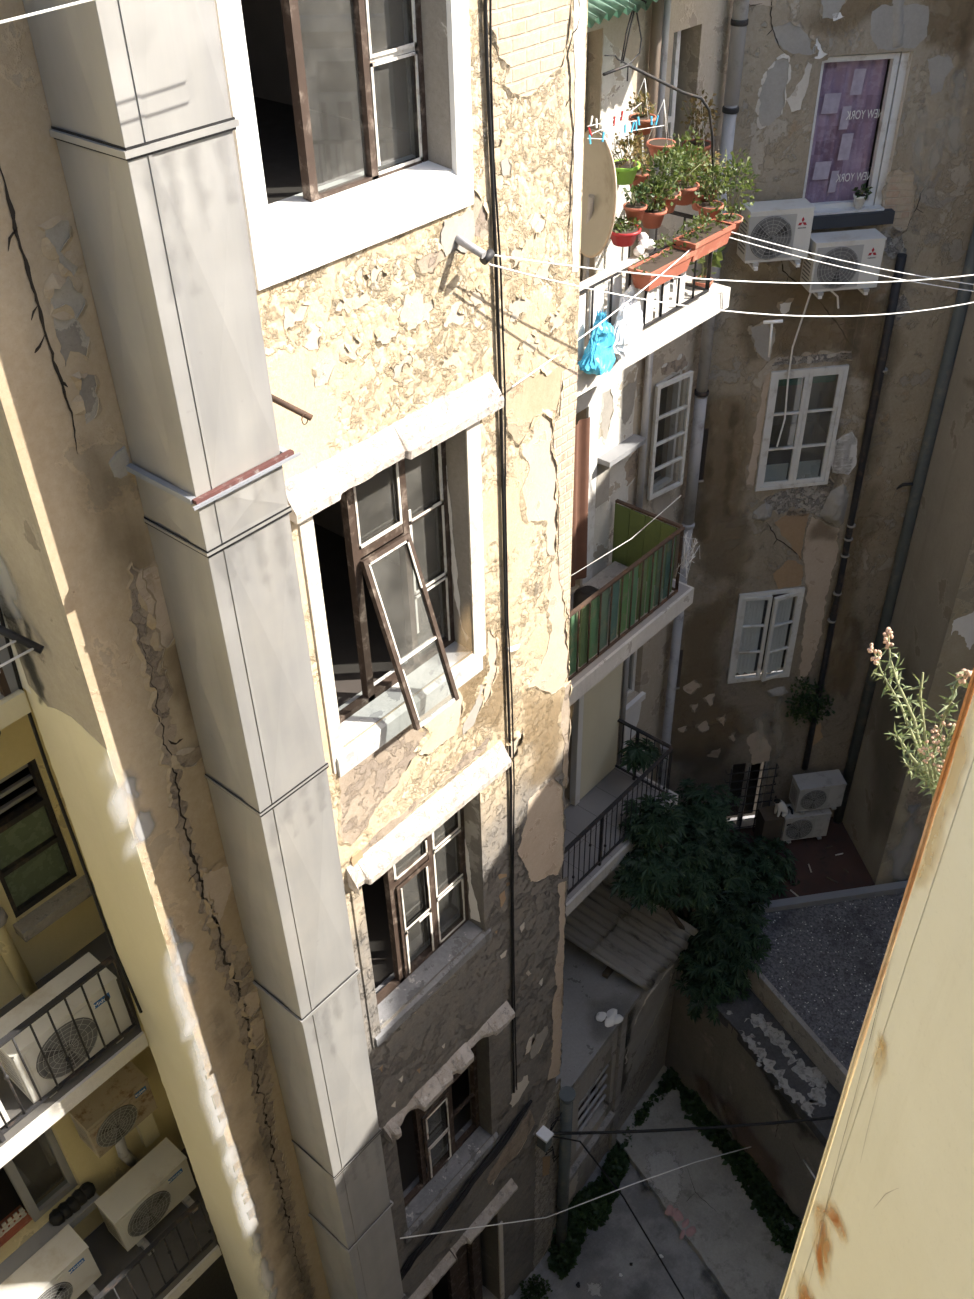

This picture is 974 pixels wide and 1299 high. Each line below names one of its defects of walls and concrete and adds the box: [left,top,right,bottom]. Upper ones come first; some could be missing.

flaking render [749,0,832,129]
flaking render [819,0,847,21]
flaking render [926,54,954,97]
crack [0,168,78,454]
peeling [51,311,103,424]
flaking render [283,258,485,388]
flaking render [415,243,445,277]
flaking render [472,183,491,244]
flaking render [947,609,974,650]
flaking render [485,213,579,1271]
flaking render [677,679,773,765]
crack [135,606,305,1288]